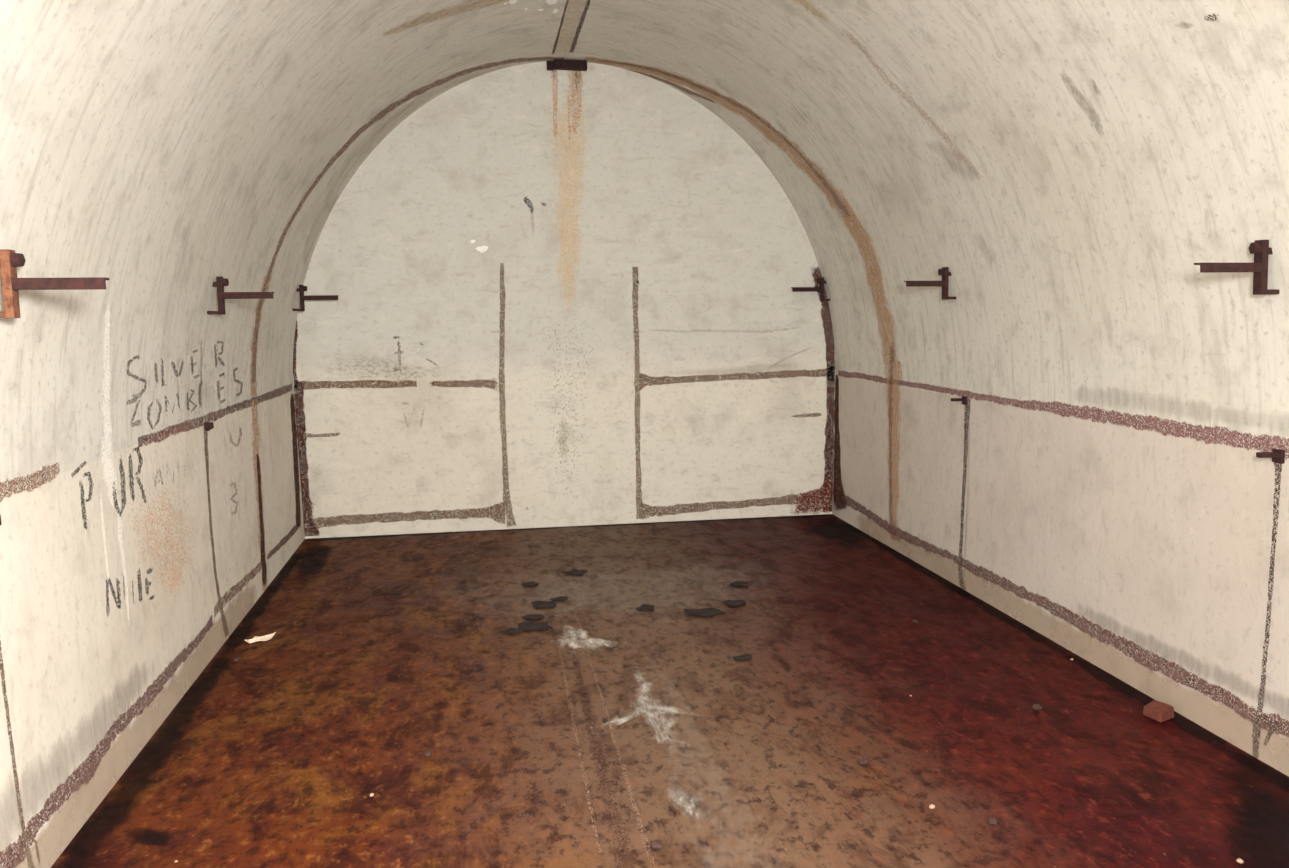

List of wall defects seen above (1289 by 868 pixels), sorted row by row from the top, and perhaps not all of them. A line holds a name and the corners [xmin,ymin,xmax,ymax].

corrosion [250,0,903,589]